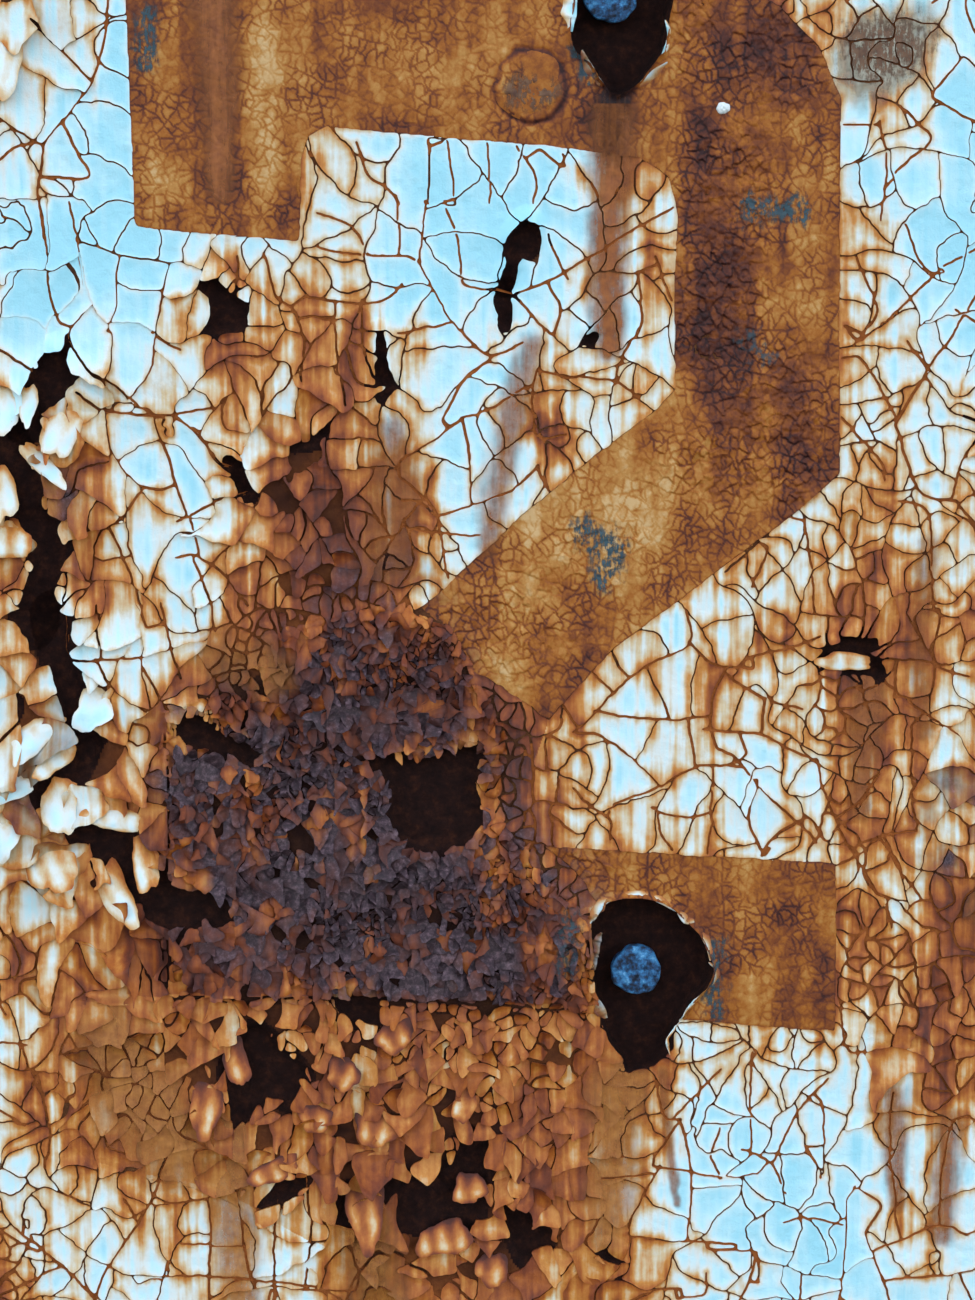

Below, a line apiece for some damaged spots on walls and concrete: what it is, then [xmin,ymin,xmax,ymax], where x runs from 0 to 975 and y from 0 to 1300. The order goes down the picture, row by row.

peeling [0,0,130,149]
crack [965,0,975,33]
spalling [486,211,552,339]
crack [0,0,674,867]
peeling [0,252,714,1300]
crack [523,56,975,1300]
rust [849,675,883,817]
rust [85,1012,208,1181]
rust [215,1120,257,1300]
crack [0,918,829,1300]
rust [885,1087,905,1210]
peeling [835,891,975,1131]